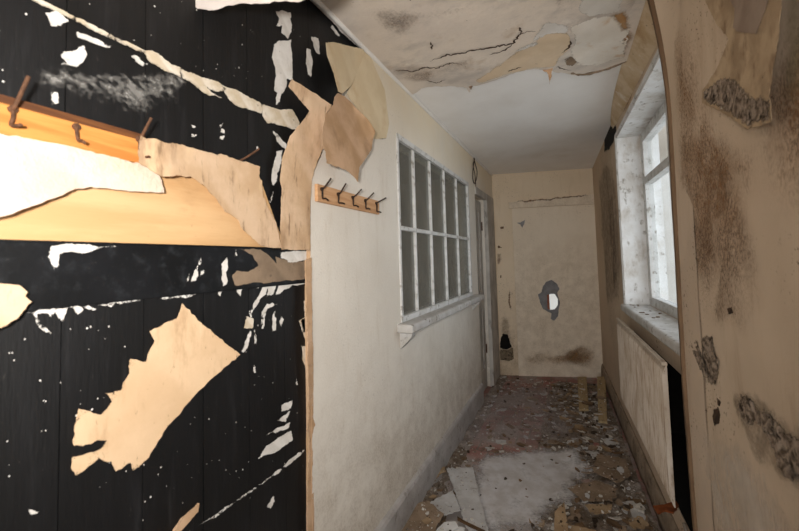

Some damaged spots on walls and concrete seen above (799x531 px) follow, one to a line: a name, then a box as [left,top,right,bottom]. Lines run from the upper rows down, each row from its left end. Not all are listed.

peeling [33,0,300,185]
peeling [306,37,320,77]
crack [399,27,535,83]
peeling [310,0,646,94]
peeling [702,0,782,129]
damp [679,53,743,315]
peeling [48,243,115,267]
peeling [28,300,140,334]
peeling [218,249,307,352]
peeling [259,401,293,459]
peeling [172,503,199,531]
peeling [203,450,305,523]